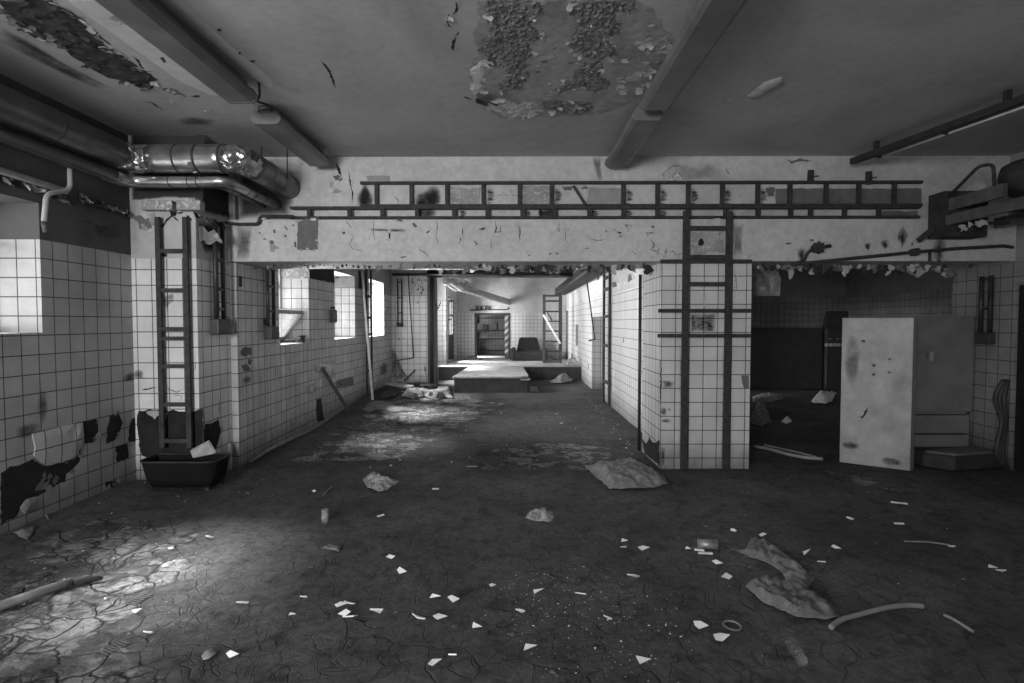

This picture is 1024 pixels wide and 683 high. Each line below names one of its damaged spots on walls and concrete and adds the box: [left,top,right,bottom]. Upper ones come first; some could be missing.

peeling [468,0,673,120]
damp [418,189,438,204]
crack [420,225,463,261]
peeling [254,216,654,303]
crack [491,222,521,251]
crack [556,223,682,259]
peeling [752,263,973,279]
peeling [0,409,224,526]
flaking render [642,437,660,465]